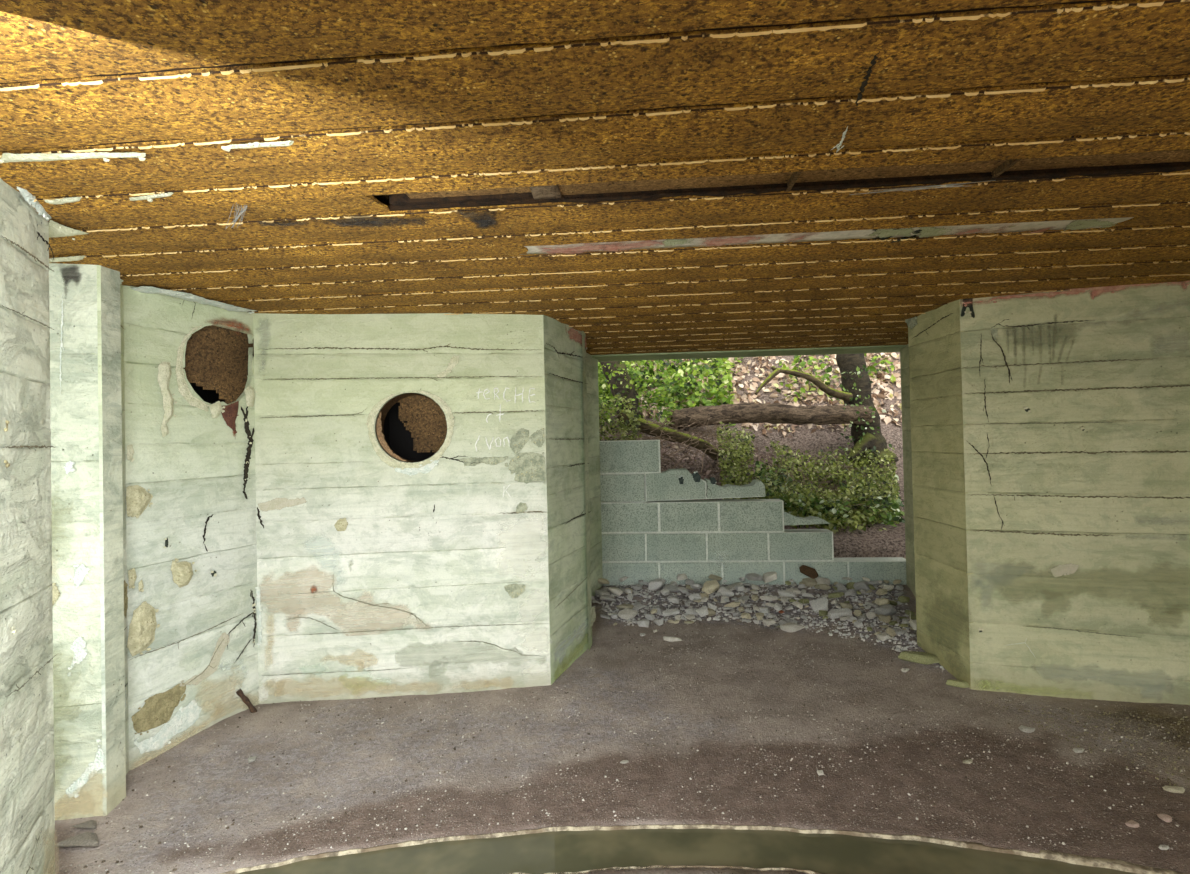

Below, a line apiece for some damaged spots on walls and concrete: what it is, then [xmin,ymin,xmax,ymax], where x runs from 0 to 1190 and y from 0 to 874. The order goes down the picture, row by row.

crack [831,51,880,152]
rust [221,401,239,436]
crack [241,407,368,528]
crack [257,344,587,384]
crack [455,408,545,416]
crack [964,319,1190,537]
crack [203,514,213,552]
peeling [255,587,263,648]
crack [125,574,587,687]
spalling [131,632,230,754]